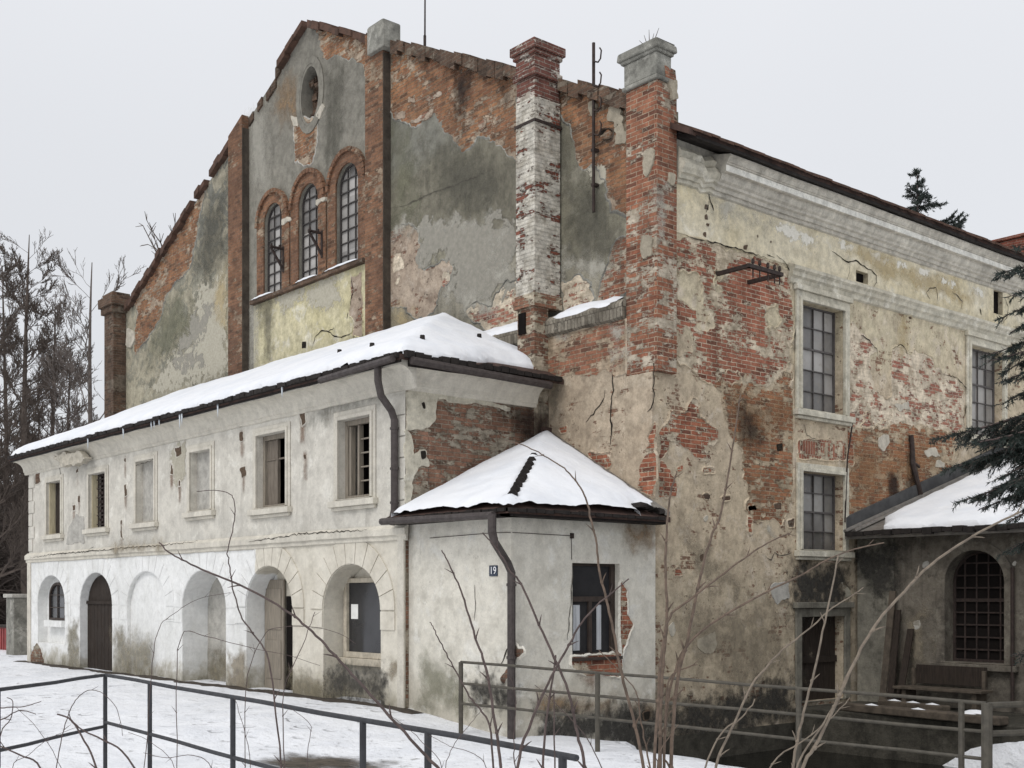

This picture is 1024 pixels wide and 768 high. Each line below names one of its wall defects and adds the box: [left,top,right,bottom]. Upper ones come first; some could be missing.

spalling [390,53,517,162]
spalling [134,191,206,356]
peeling [391,222,454,320]
spalling [465,279,518,331]
crack [832,251,877,286]
crack [586,375,614,443]
crack [647,363,655,412]
spalling [637,214,967,536]
leakage [785,541,900,621]
spalling [569,579,634,683]